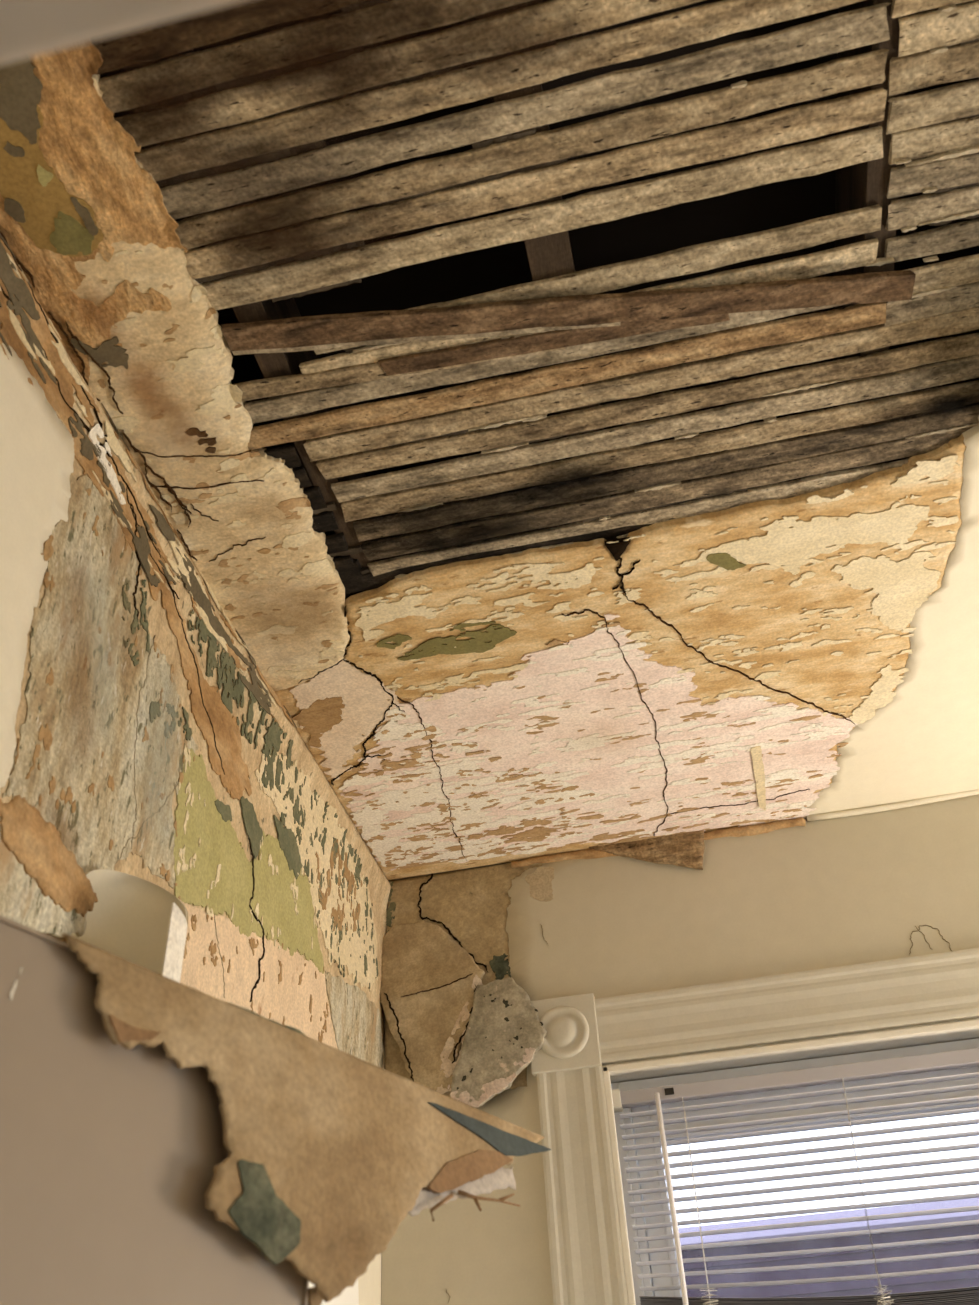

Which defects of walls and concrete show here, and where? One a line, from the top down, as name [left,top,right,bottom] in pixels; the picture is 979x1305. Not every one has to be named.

crack [0,232,266,863]
crack [292,606,464,856]
crack [561,553,853,836]
crack [214,838,265,1002]
crack [384,874,489,1082]
flaking render [493,1067,527,1098]
peeling [408,1167,516,1217]